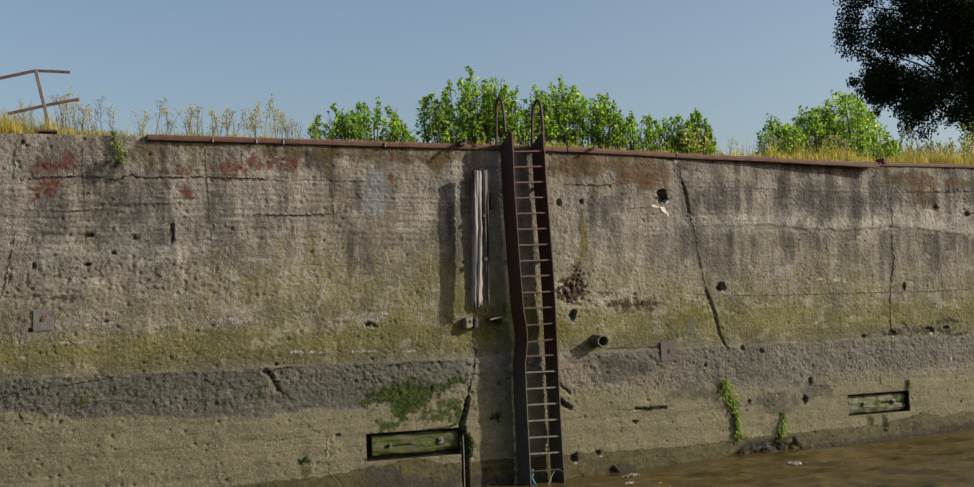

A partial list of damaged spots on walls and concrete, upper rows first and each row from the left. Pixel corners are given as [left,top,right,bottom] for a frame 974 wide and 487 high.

crack [0,141,365,299]
rust [243,143,456,174]
crack [666,158,974,384]
crack [217,366,292,405]
crack [368,334,477,487]